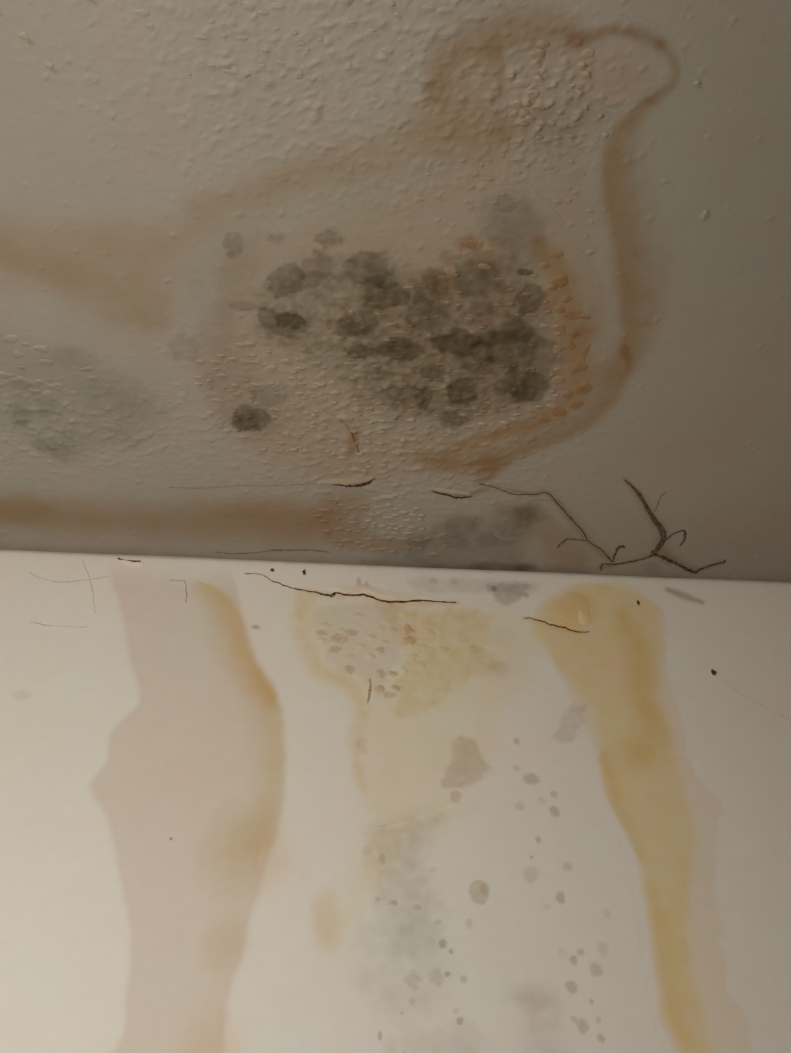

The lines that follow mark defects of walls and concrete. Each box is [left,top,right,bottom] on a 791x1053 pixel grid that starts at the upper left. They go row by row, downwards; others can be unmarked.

leakage [0,0,689,575]
crack [217,549,462,612]
leakage [83,556,759,1053]